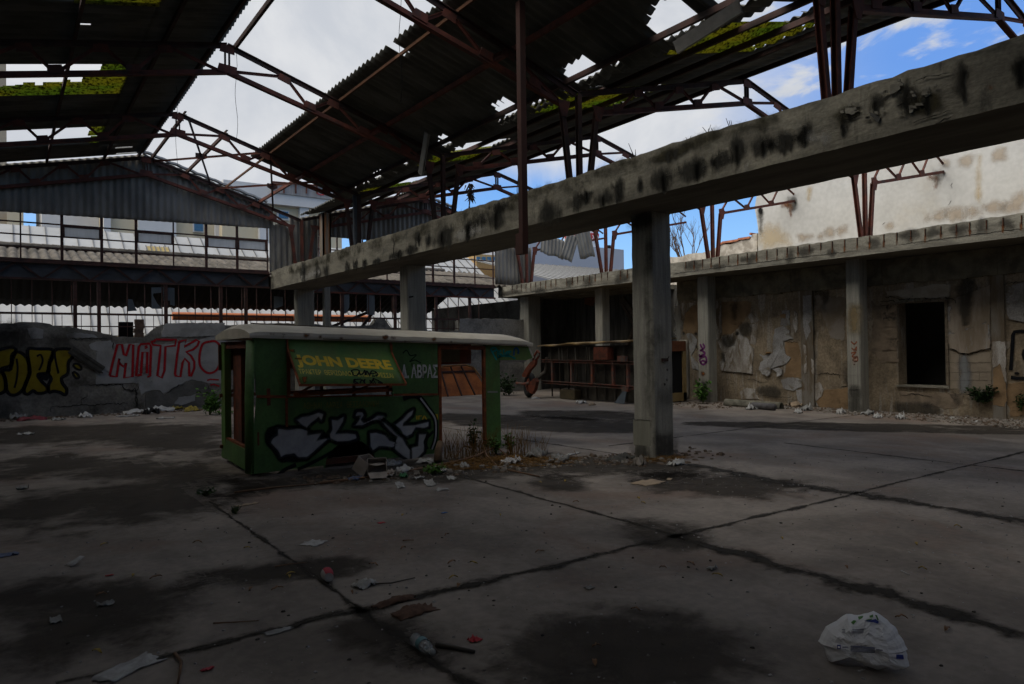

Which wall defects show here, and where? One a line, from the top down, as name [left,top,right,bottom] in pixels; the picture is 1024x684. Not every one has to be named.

damp [637,115,828,193]
damp [834,106,858,137]
damp [871,79,941,115]
damp [1011,55,1024,88]
damp [289,194,518,282]
flaking render [716,295,848,409]